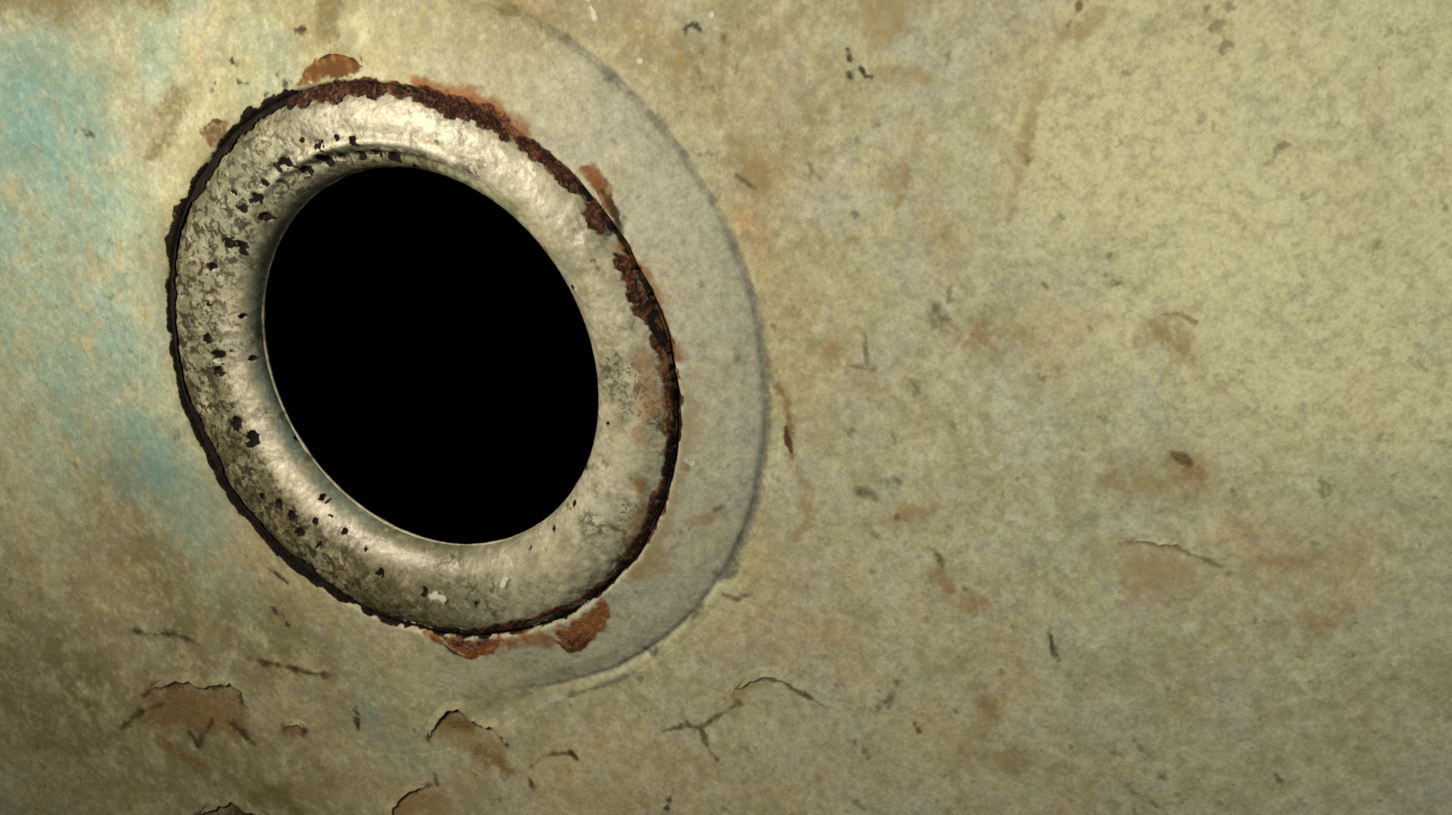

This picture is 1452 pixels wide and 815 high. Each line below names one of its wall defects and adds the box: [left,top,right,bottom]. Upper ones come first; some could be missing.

corrosion [164,45,684,660]
peeling [424,700,534,787]
crack [668,667,816,760]